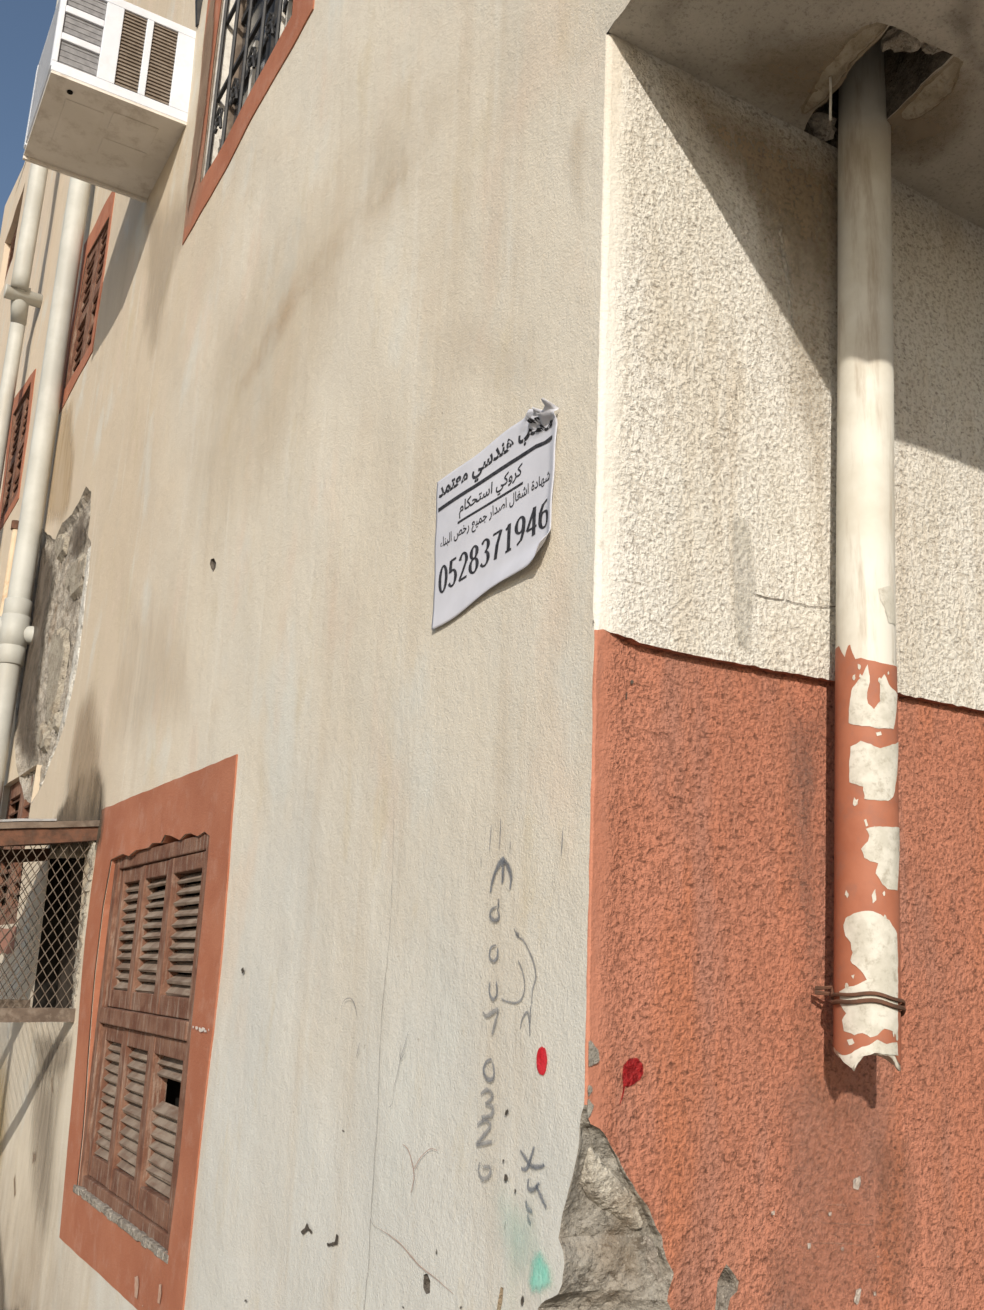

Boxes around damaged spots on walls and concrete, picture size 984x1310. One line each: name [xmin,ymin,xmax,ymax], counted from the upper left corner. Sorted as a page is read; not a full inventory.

spalling [801,22,963,149]
spalling [14,487,91,803]
spalling [521,1085,674,1310]
water stain [0,1258,16,1310]
spalling [715,1264,739,1310]